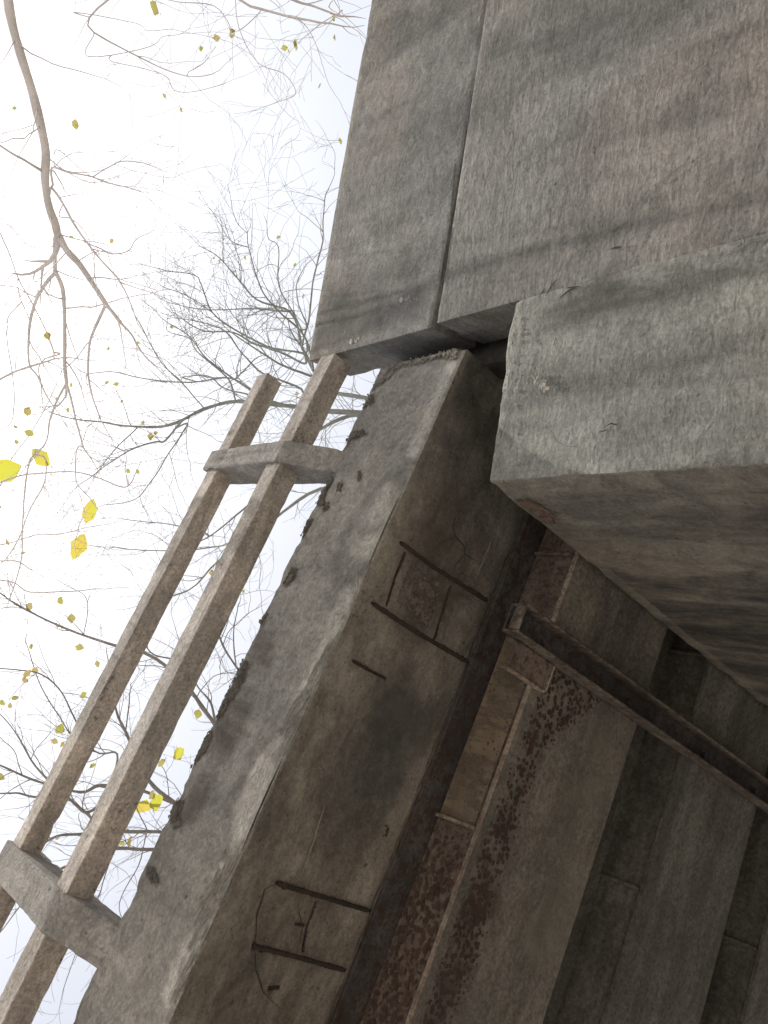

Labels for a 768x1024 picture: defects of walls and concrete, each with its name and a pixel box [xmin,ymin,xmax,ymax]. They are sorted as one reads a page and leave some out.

spalling [345,429,366,441]
spalling [300,476,343,538]
spalling [370,541,488,663]
peeling [167,628,342,1005]
rust [363,670,602,1024]
spalling [251,881,372,972]